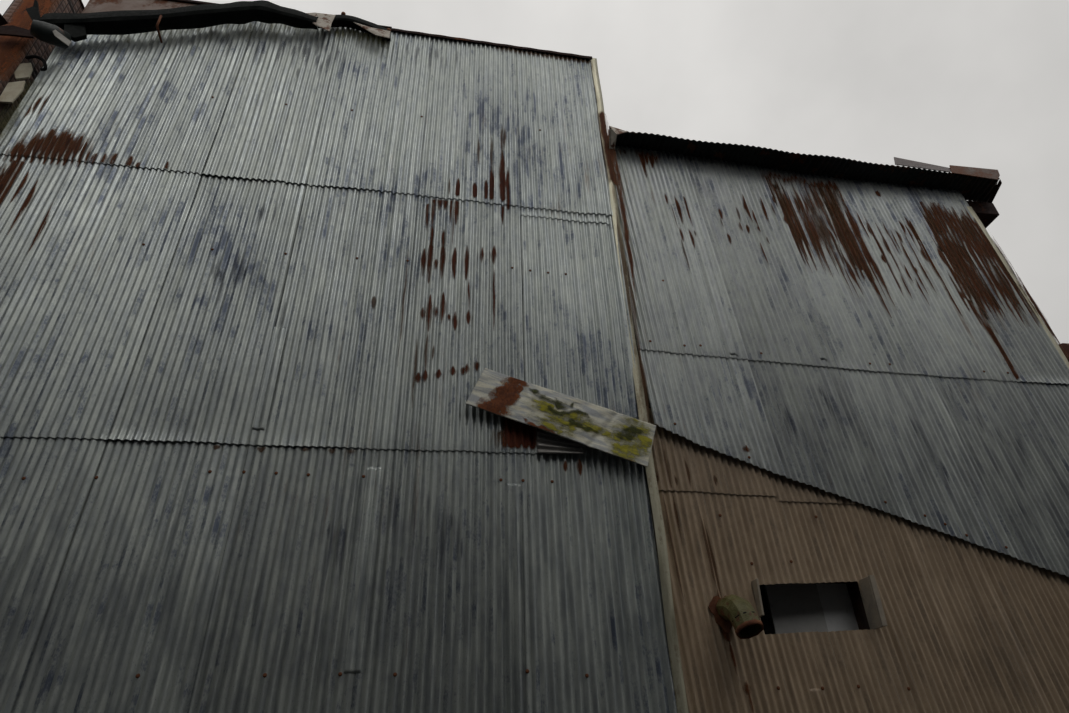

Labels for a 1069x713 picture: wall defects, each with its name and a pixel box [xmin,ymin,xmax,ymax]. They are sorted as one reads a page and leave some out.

corrosion [0,129,140,228]
corrosion [473,129,510,221]
corrosion [27,210,50,254]
corrosion [398,250,409,354]
corrosion [412,178,496,406]
corrosion [665,195,696,269]
corrosion [719,173,1068,379]
corrosion [477,377,554,449]